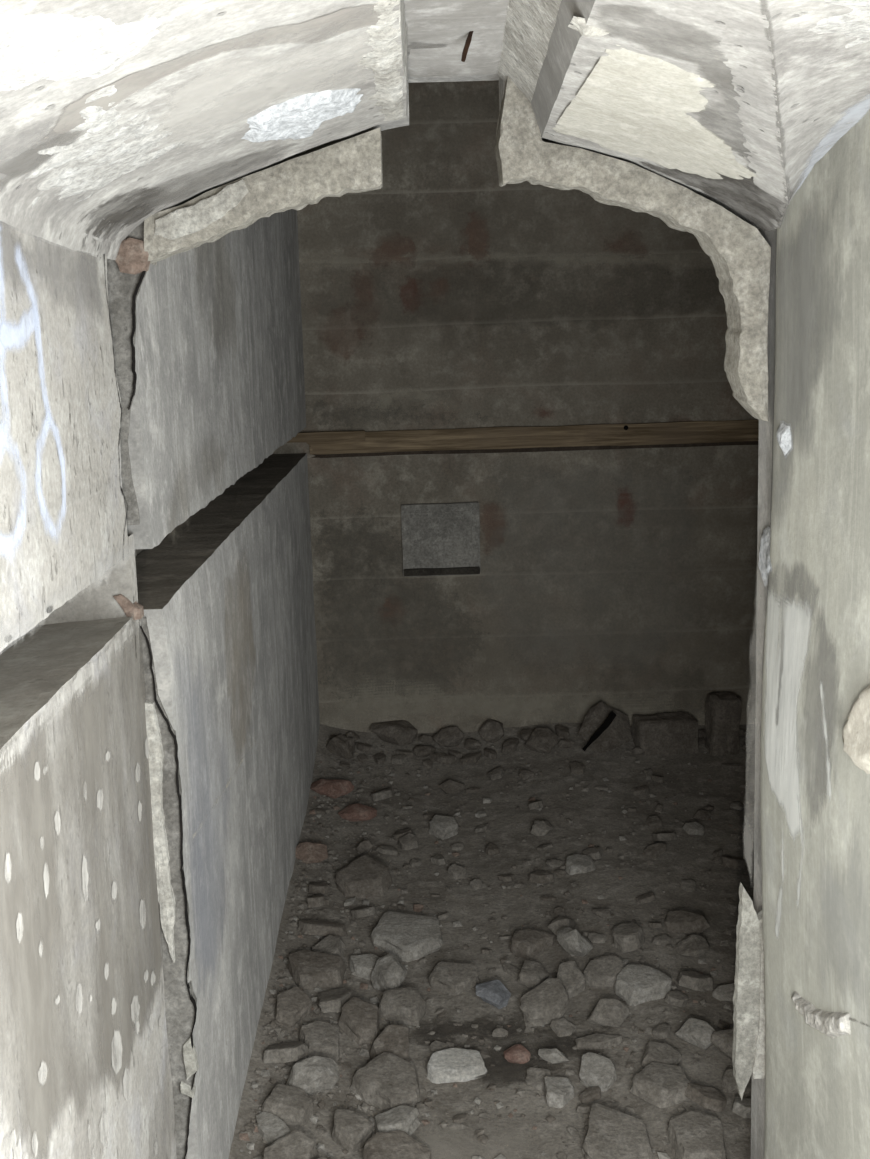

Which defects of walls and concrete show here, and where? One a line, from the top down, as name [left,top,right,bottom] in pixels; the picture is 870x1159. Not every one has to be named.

peeling [241,0,404,142]
crack [104,238,150,560]
water stain [0,632,162,1159]
crack [113,594,199,1159]
flaking render [791,991,863,1038]
flaking render [842,685,870,774]